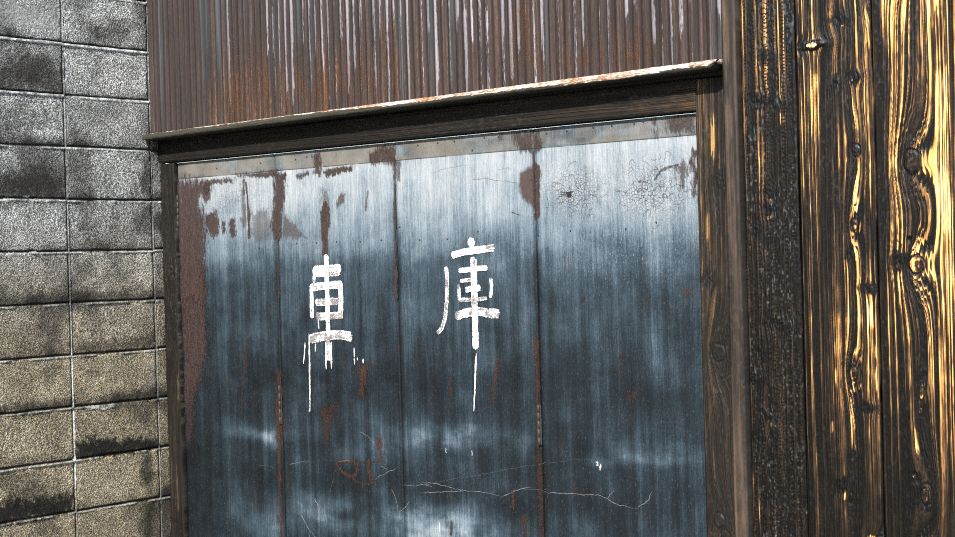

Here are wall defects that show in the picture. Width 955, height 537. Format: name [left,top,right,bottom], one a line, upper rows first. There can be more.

damp [0,0,64,95]
corrosion [651,114,695,136]
damp [0,164,64,199]
damp [140,163,151,196]
corrosion [513,129,543,219]
corrosion [177,151,353,401]
damp [0,400,71,413]
damp [72,433,159,485]
damp [0,491,74,525]